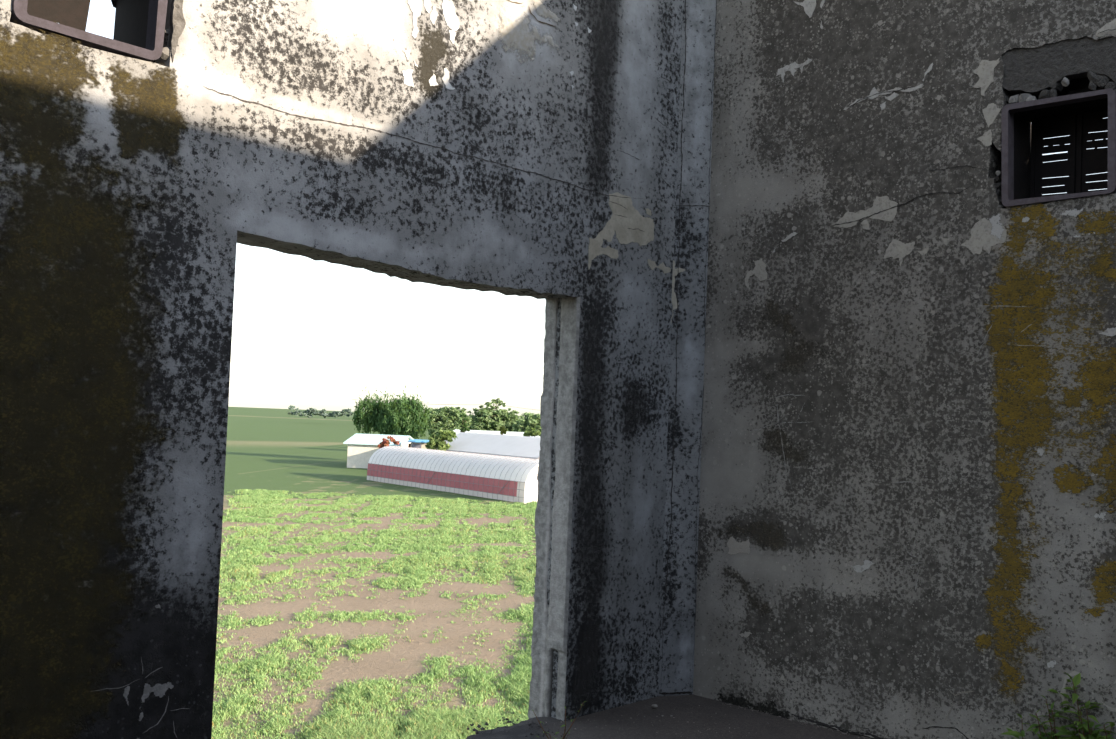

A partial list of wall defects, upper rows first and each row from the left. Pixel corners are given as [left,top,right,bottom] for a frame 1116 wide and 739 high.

leakage [0,22,191,178]
crack [204,86,636,199]
peeling [402,0,460,90]
peeling [794,0,825,29]
spalling [970,37,1116,208]
spalling [588,192,654,269]
peeling [832,196,898,230]
peeling [884,235,929,266]
peeling [941,218,1007,254]
crack [621,0,717,695]
leakage [988,204,1116,667]
leakage [575,316,608,702]